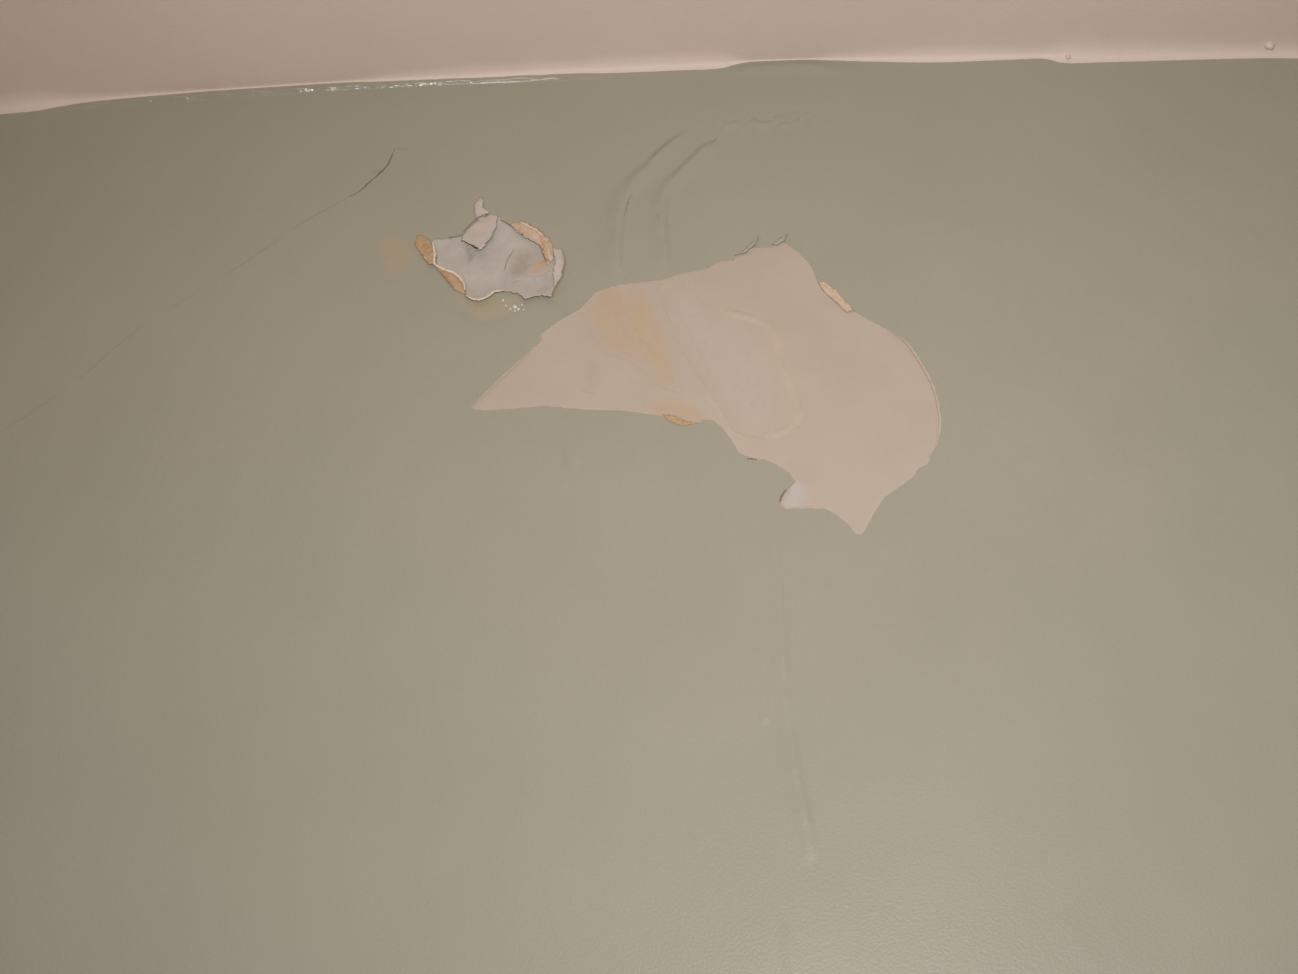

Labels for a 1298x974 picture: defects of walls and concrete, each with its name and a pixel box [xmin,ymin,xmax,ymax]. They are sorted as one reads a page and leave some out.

peeling [415,197,564,312]
peeling [471,235,942,535]